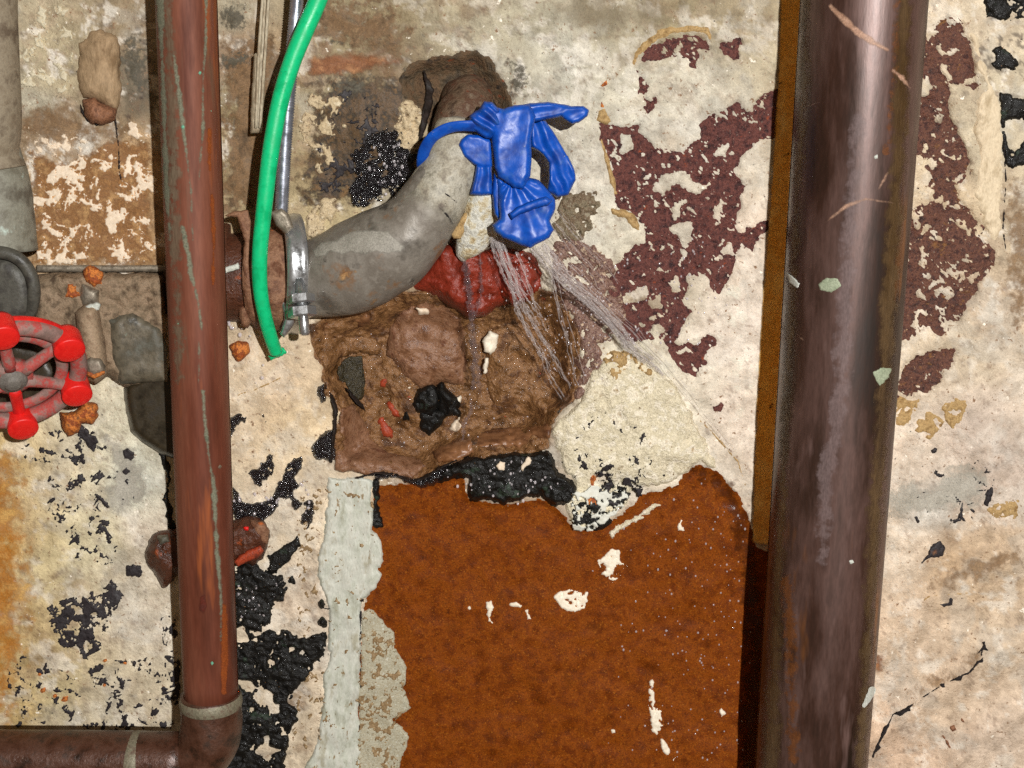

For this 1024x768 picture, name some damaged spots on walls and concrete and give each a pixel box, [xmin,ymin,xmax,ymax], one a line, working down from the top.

peeling [26,122,158,265]
damp [297,67,419,208]
damp [317,384,326,403]
damp [372,0,810,768]
corrosion [603,350,652,380]
damp [21,425,145,565]
damp [159,453,176,529]
damp [126,564,143,578]
damp [201,390,336,768]
damp [7,580,181,730]
crack [872,641,988,758]